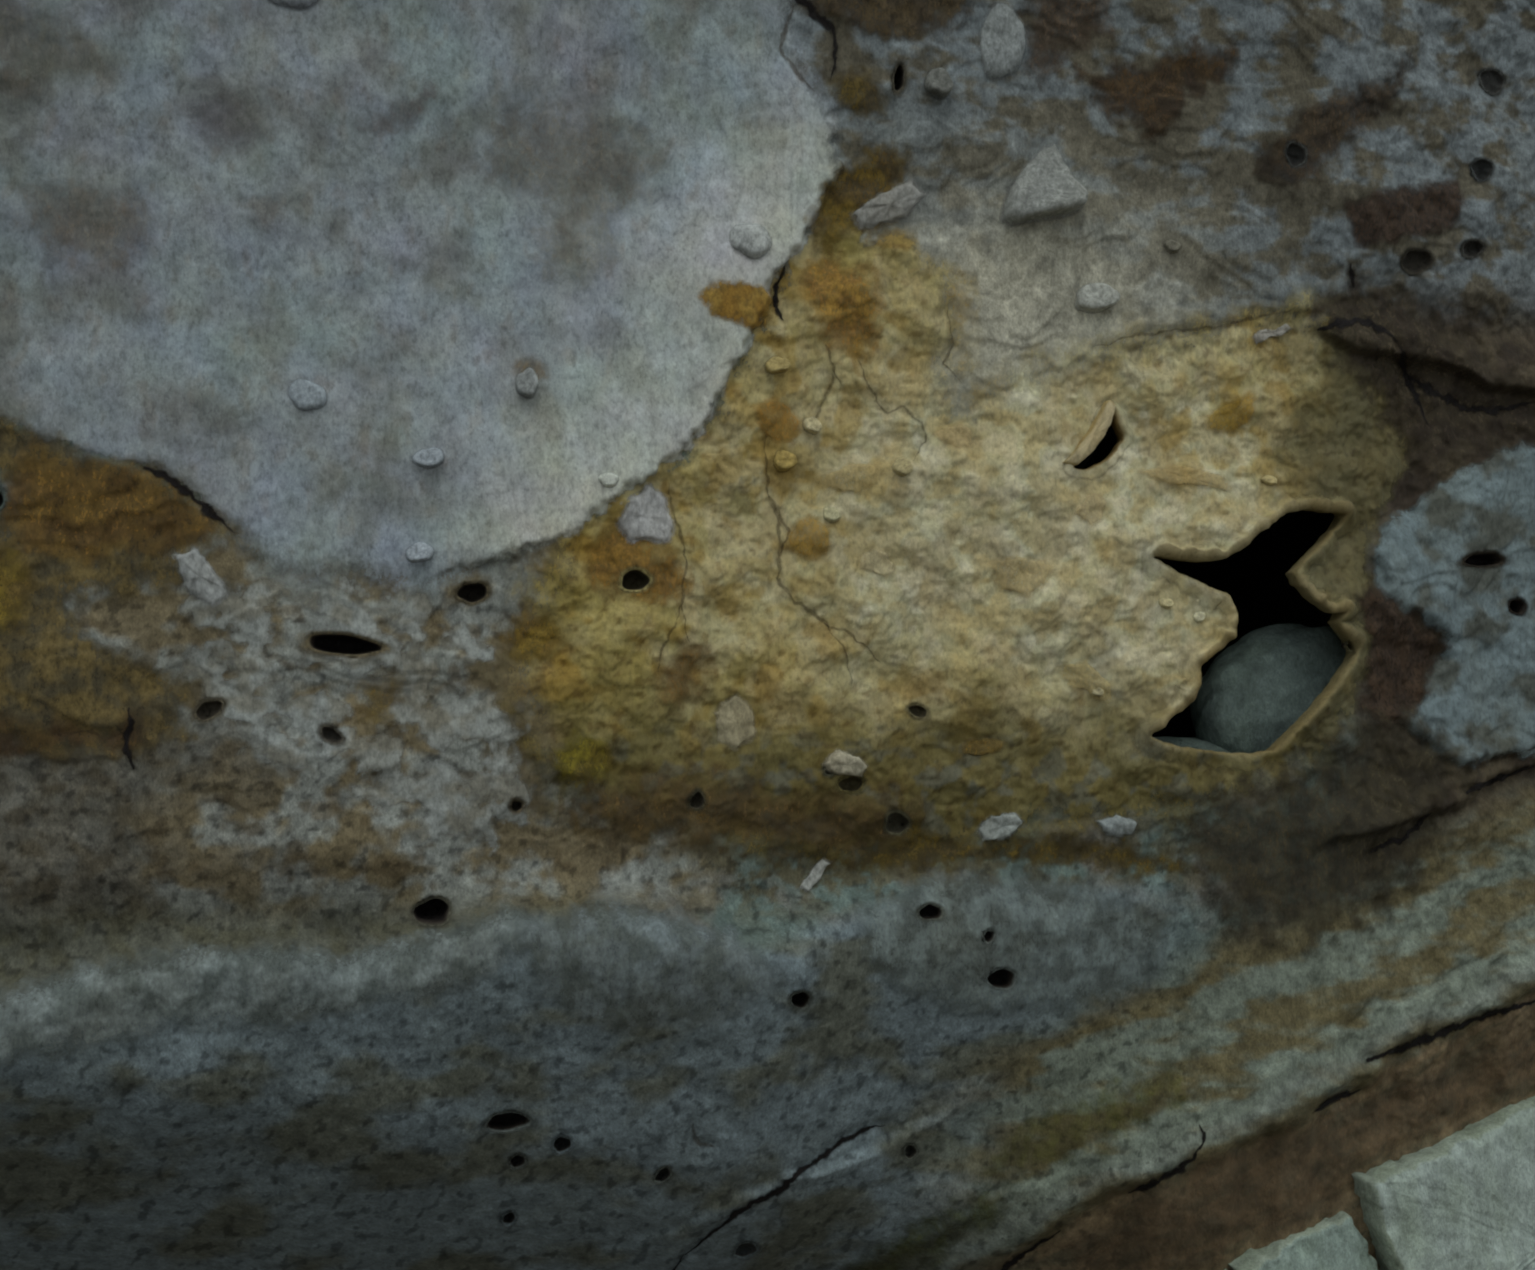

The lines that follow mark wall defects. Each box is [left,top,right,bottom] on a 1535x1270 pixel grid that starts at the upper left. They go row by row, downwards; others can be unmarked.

crack [779,0,838,85]
spalling [174,180,1408,891]
crack [673,1125,885,1270]